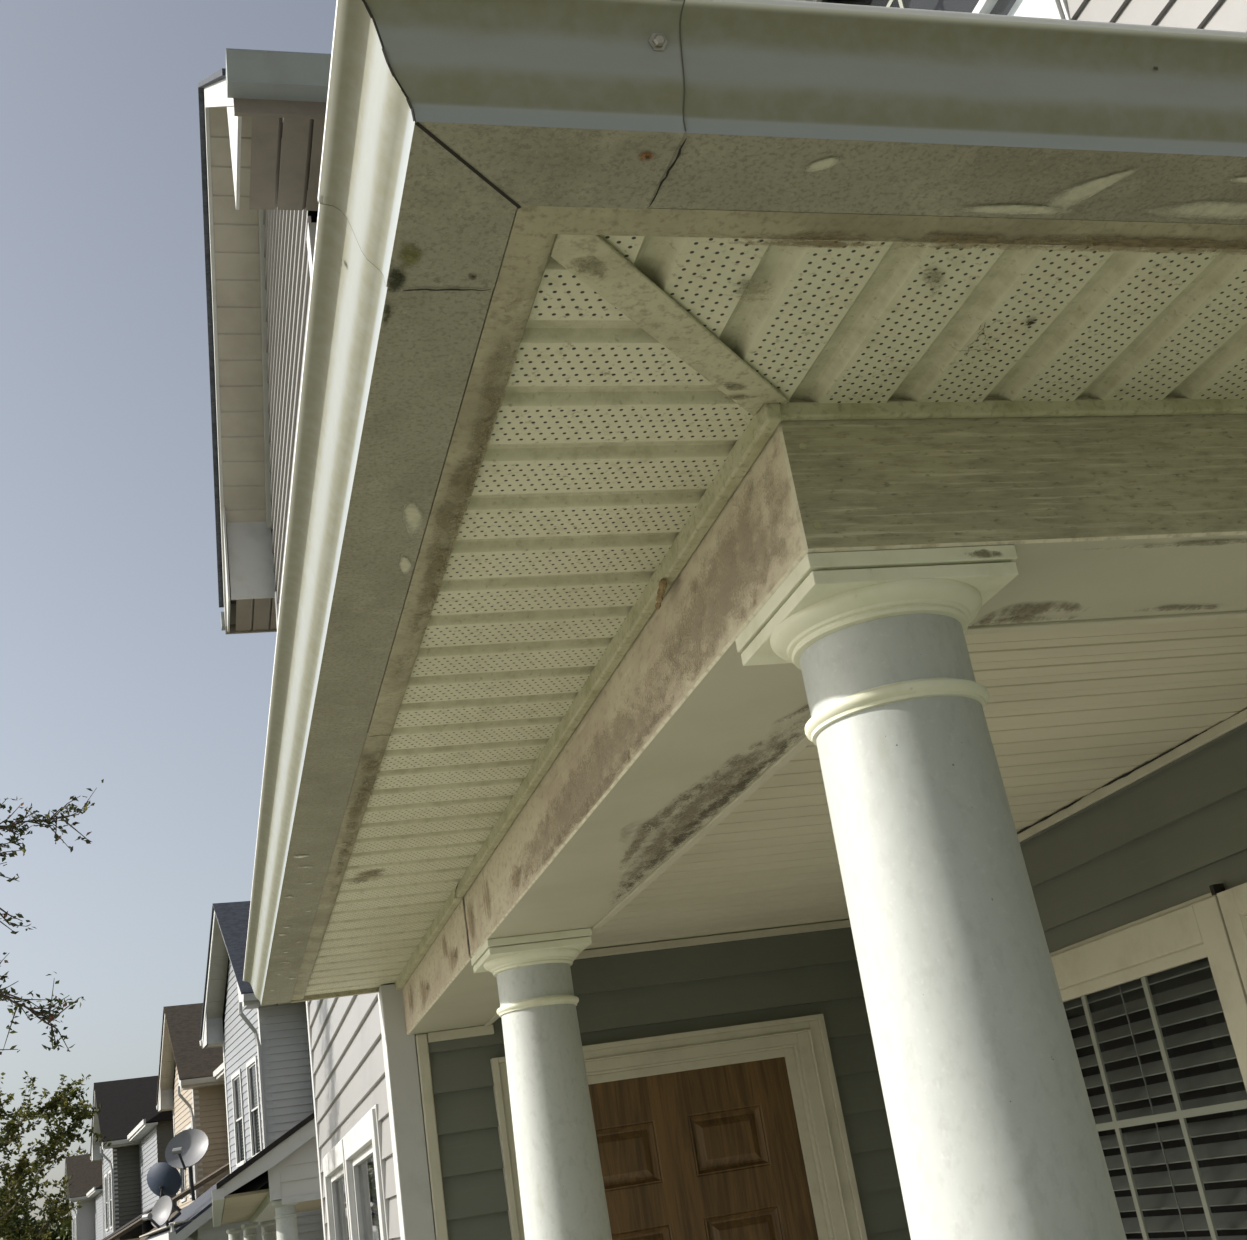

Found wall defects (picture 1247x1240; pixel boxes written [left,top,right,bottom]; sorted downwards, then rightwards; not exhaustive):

crack [649,138,687,207]
peeling [966,170,1134,214]
peeling [1171,202,1247,218]
damp [384,246,421,322]
crack [403,286,491,294]
peeling [404,503,422,533]
peeling [399,557,411,573]
damp [518,474,786,879]
damp [619,734,798,897]